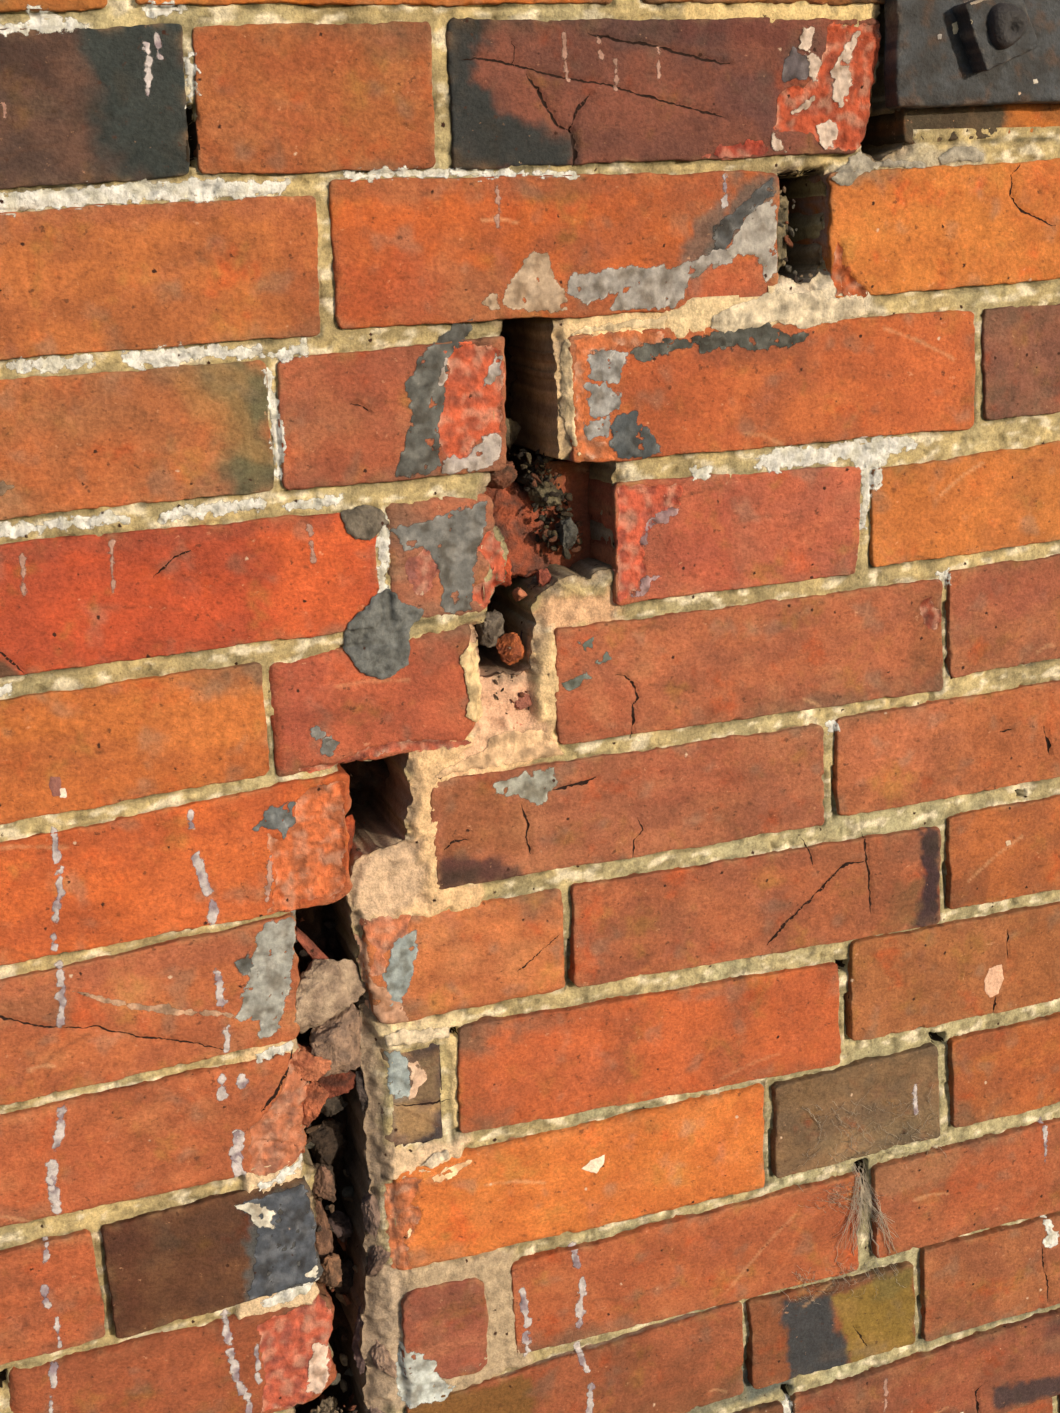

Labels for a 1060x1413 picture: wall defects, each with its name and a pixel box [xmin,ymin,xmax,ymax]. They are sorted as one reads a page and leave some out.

spalling [702,22,881,160]
spalling [395,178,778,478]
crack [500,331,538,486]
crack [340,758,390,806]
water stain [50,827,67,1028]
crack [294,904,341,976]
spalling [234,726,471,1039]
water stain [45,1105,67,1214]
water stain [229,1129,303,1191]
crack [261,1028,352,1413]
water stain [220,1309,263,1413]
spalling [235,1184,333,1413]